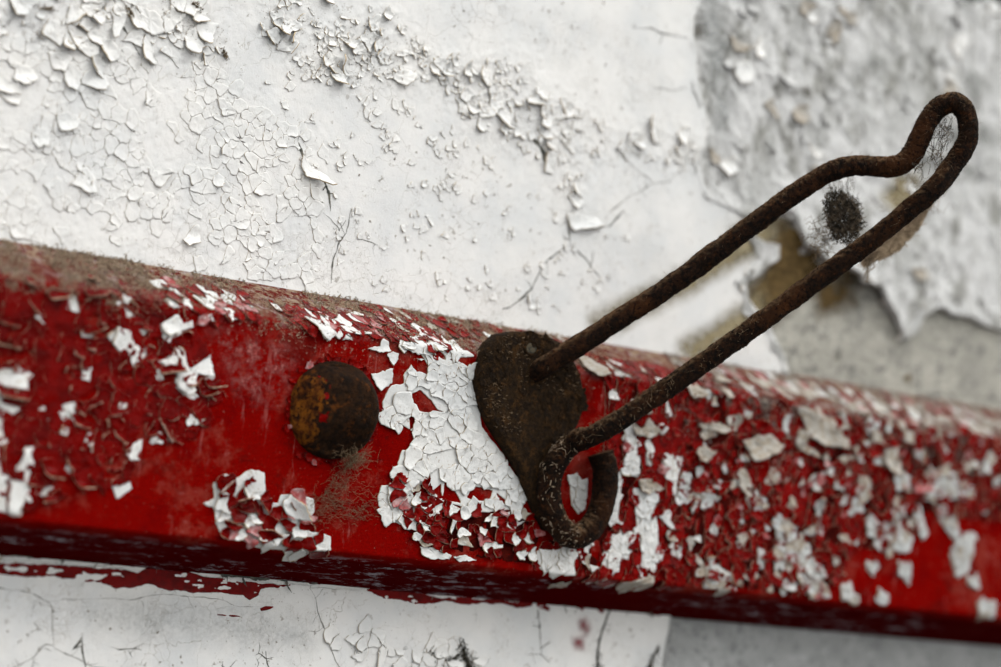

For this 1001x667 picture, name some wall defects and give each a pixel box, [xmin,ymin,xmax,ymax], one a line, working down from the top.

peeling [723,35,765,84]
peeling [0,0,374,293]
peeling [260,0,610,242]
peeling [618,114,749,176]
corrosion [875,176,919,213]
corrosion [659,218,819,358]
corrosion [817,270,855,313]
peeling [0,273,262,517]
peeling [223,261,1001,622]
peeling [203,470,331,562]
crack [0,568,340,667]
crack [529,611,550,662]